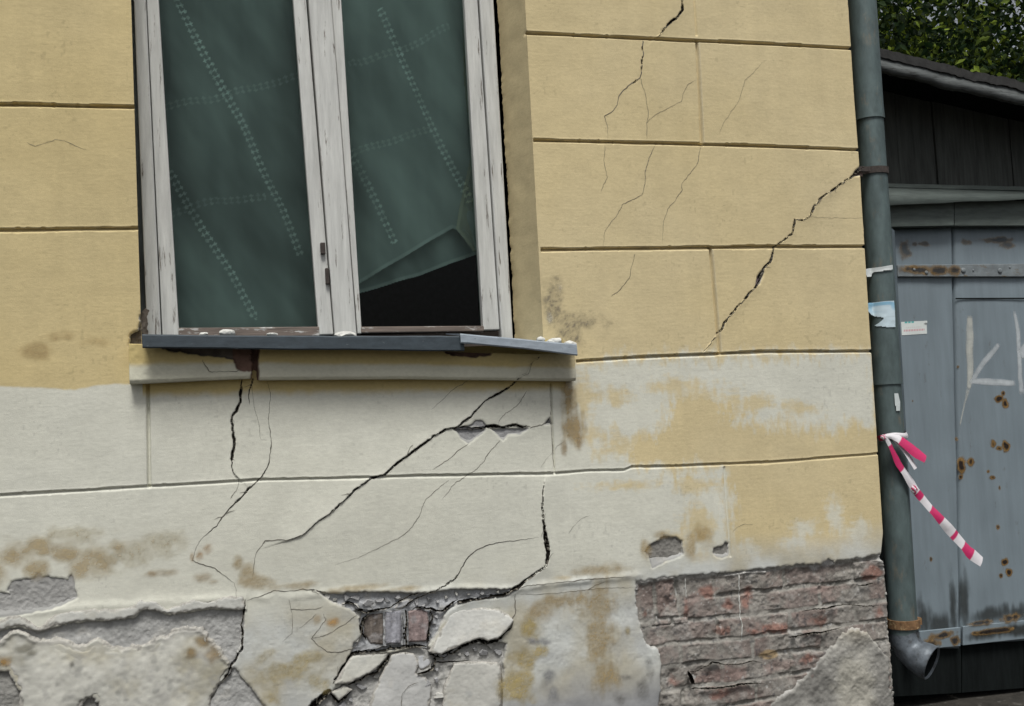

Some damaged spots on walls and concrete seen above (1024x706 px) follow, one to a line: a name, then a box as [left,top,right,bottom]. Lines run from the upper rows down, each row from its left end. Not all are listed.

crack [602,0,692,234]
crack [704,167,864,351]
spalling [456,421,526,440]
leakage [563,384,580,449]
leakage [5,539,107,575]
crack [192,357,635,706]
spalling [645,536,681,558]
spalling [713,543,727,554]
spalling [0,672,20,706]
spalling [0,573,245,664]
spalling [317,588,513,706]
flaking render [635,554,894,706]